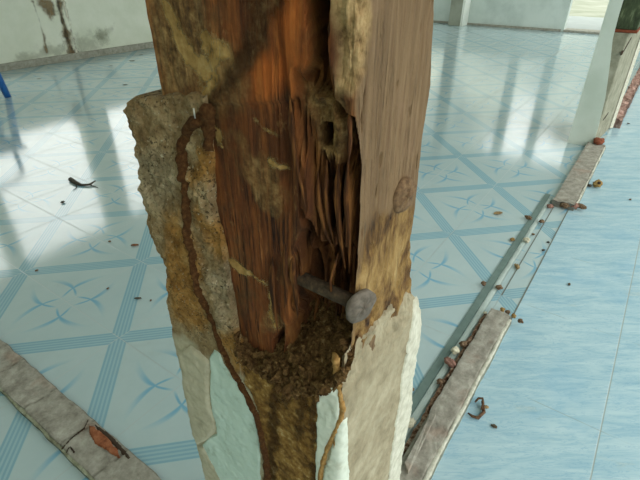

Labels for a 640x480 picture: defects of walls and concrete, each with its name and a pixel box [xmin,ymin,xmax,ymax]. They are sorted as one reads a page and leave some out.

leakage [32,0,55,16]
peeling [179,345,261,480]
peeling [315,388,350,480]
peeling [388,296,422,480]